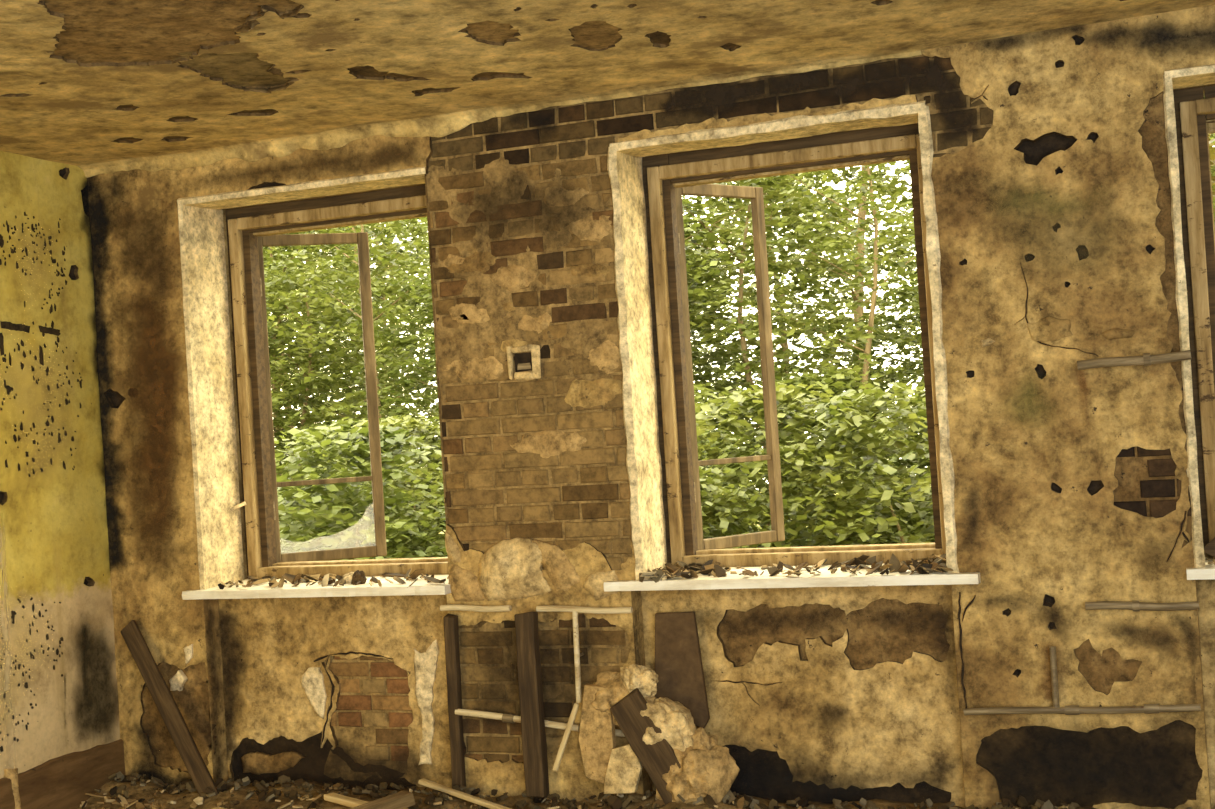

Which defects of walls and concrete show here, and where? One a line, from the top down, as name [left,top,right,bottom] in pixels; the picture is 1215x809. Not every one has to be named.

hole [1016,133,1099,166]
water stain [81,177,173,566]
flaking render [426,55,994,570]
flaking render [1088,92,1200,547]
water stain [75,626,118,732]
flaking render [142,685,188,771]
flaking render [158,644,216,766]
flaking render [232,639,440,790]
flaking render [719,598,950,670]
flaking render [977,720,1209,809]
flaking render [1074,639,1142,695]